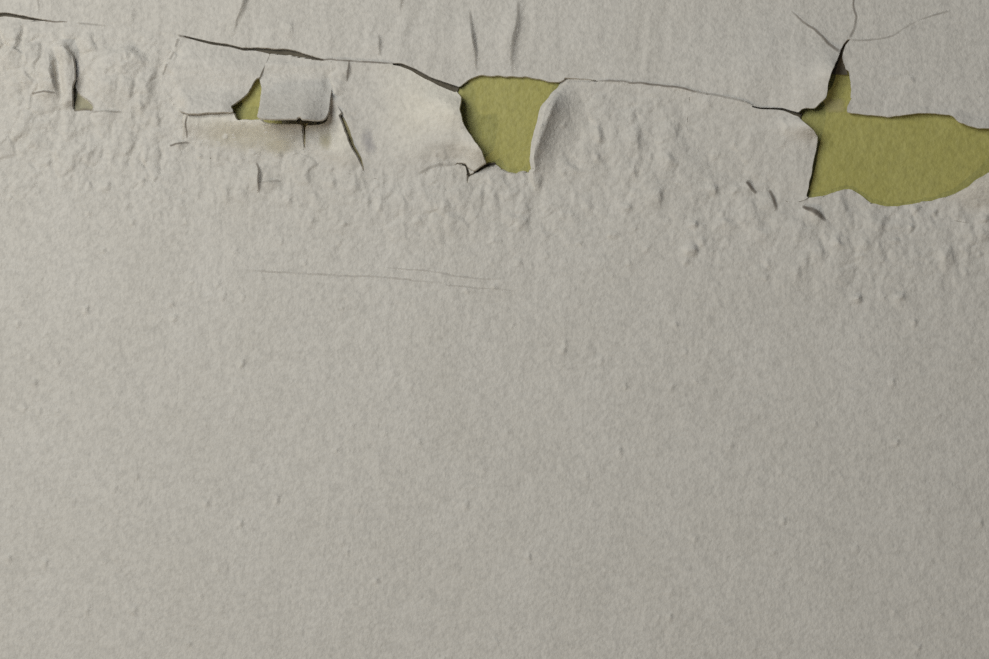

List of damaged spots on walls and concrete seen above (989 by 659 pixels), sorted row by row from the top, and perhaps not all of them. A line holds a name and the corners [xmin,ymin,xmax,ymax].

crack [0,13,58,22]
peeling [0,20,93,117]
crack [186,37,326,61]
crack [365,61,458,92]
crack [824,39,849,75]
peeling [162,36,596,199]
crack [754,107,802,118]
peeling [687,12,989,226]
crack [341,115,363,165]
crack [462,162,495,177]